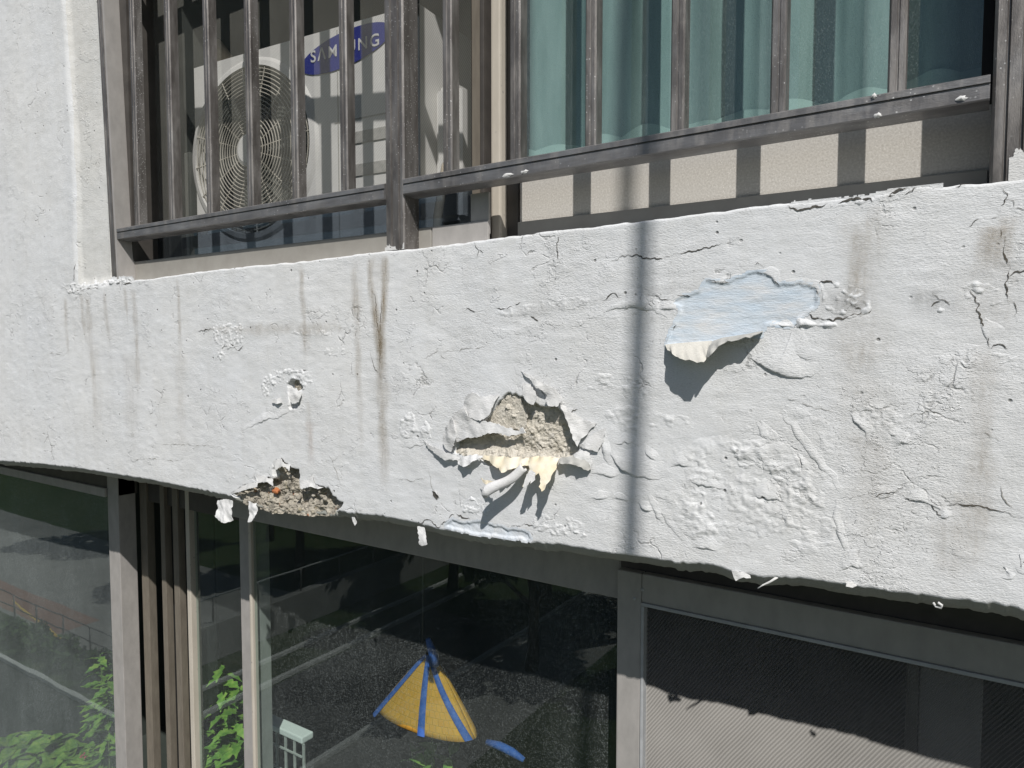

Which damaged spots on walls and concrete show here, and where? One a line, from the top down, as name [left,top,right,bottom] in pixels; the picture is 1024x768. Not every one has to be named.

crack [601,238,737,264]
peeling [652,262,872,363]
crack [970,189,1024,349]
peeling [242,368,313,431]
spalling [215,458,343,523]
spalling [398,371,606,546]